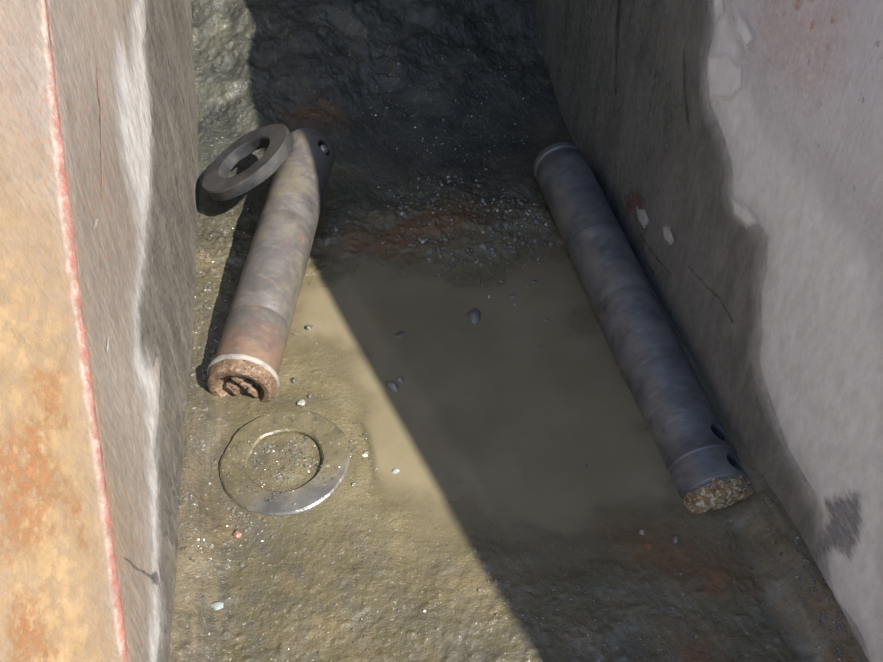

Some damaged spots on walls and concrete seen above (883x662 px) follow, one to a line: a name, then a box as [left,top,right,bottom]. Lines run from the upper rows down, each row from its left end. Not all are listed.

crack [128,559,159,584]
leakage [534,0,883,662]